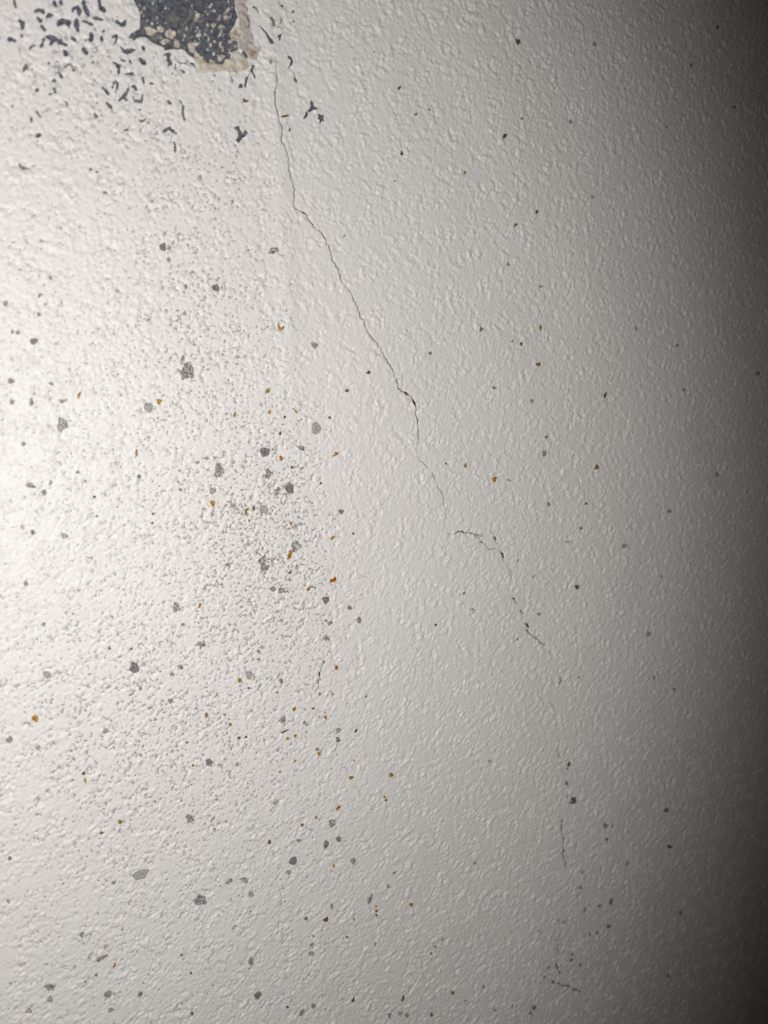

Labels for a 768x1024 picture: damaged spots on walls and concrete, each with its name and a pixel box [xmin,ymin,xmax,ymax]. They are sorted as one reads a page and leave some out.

peeling [7,0,295,123]
crack [271,56,419,440]